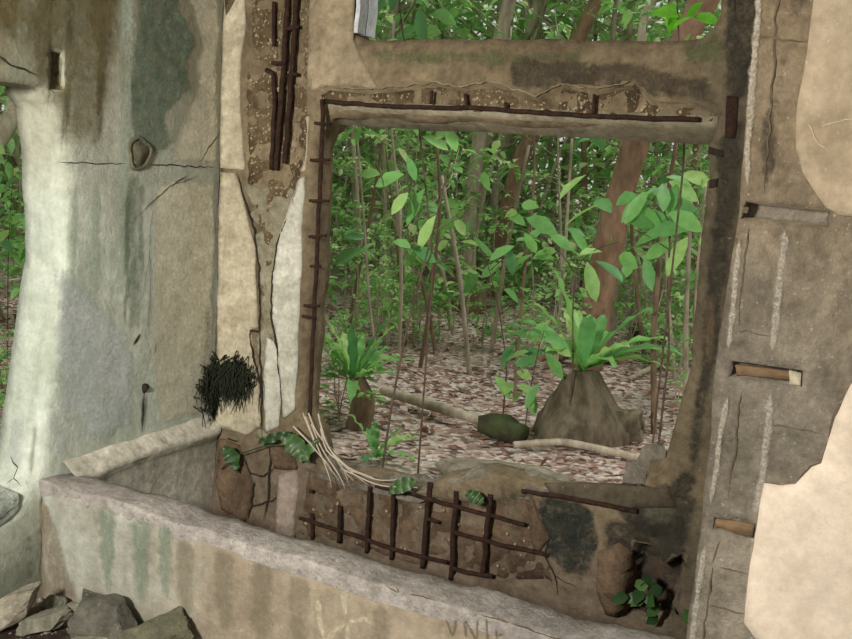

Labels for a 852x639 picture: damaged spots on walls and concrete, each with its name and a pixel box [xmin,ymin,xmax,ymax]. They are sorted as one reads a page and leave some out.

crack [0,56,36,75]
crack [61,159,126,167]
leakage [0,0,219,315]
leakage [689,0,756,99]
crack [757,0,808,194]
leakage [55,190,132,435]
leakage [153,180,215,422]
crack [133,132,286,522]
peeling [215,0,676,582]
leakage [692,122,741,460]
leakage [539,473,694,601]
crack [702,542,747,639]